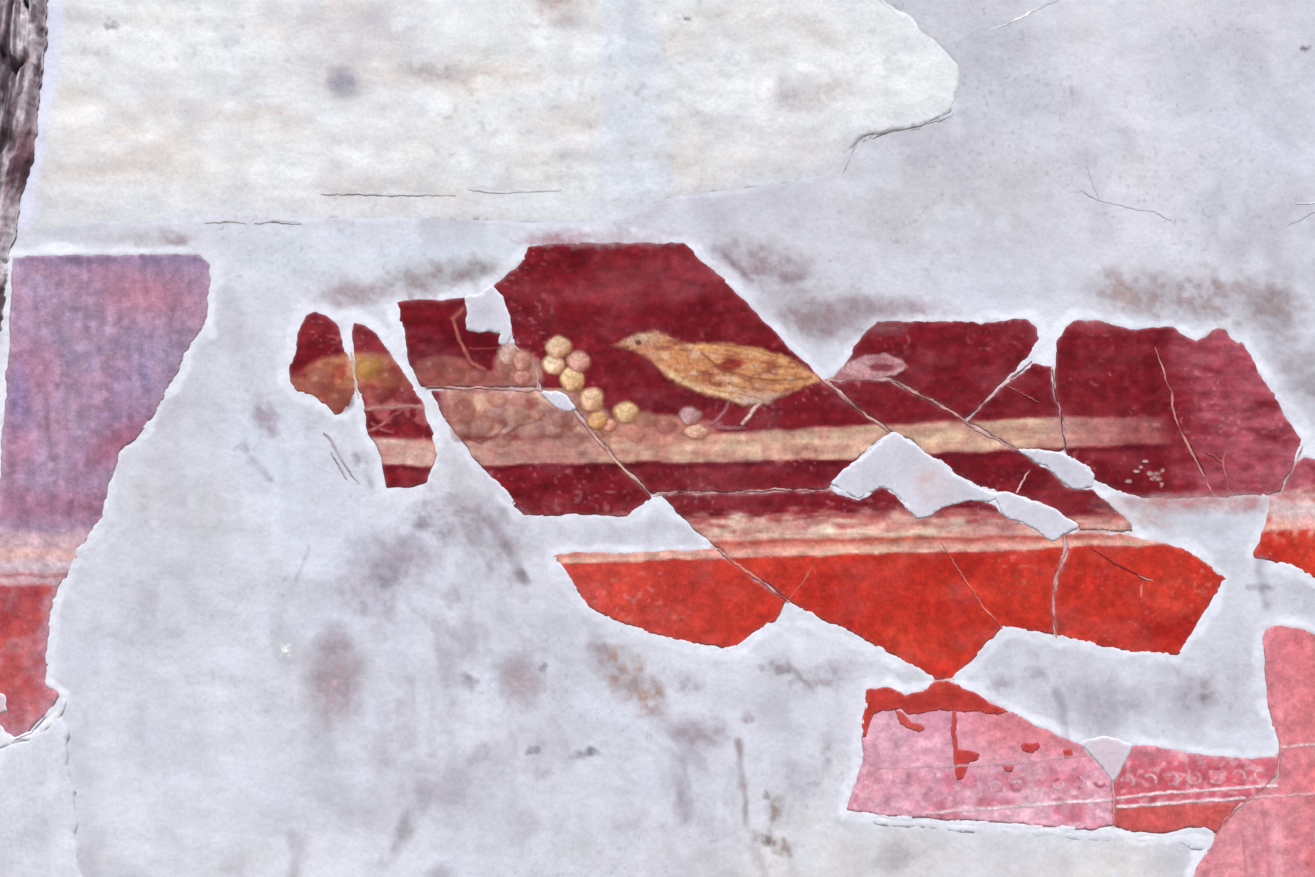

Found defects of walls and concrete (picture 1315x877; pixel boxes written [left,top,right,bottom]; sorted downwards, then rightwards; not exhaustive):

flaking render [464,286,512,346]
crack [425,345,541,392]
flaking render [541,390,576,412]
crack [573,411,832,495]
crack [824,380,891,433]
flaking render [831,432,1079,541]
crack [890,360,1066,493]
flaking render [1018,449,1095,490]
crack [1155,348,1228,497]
crack [717,548,816,602]
crack [941,543,1003,629]
crack [1052,545,1153,637]